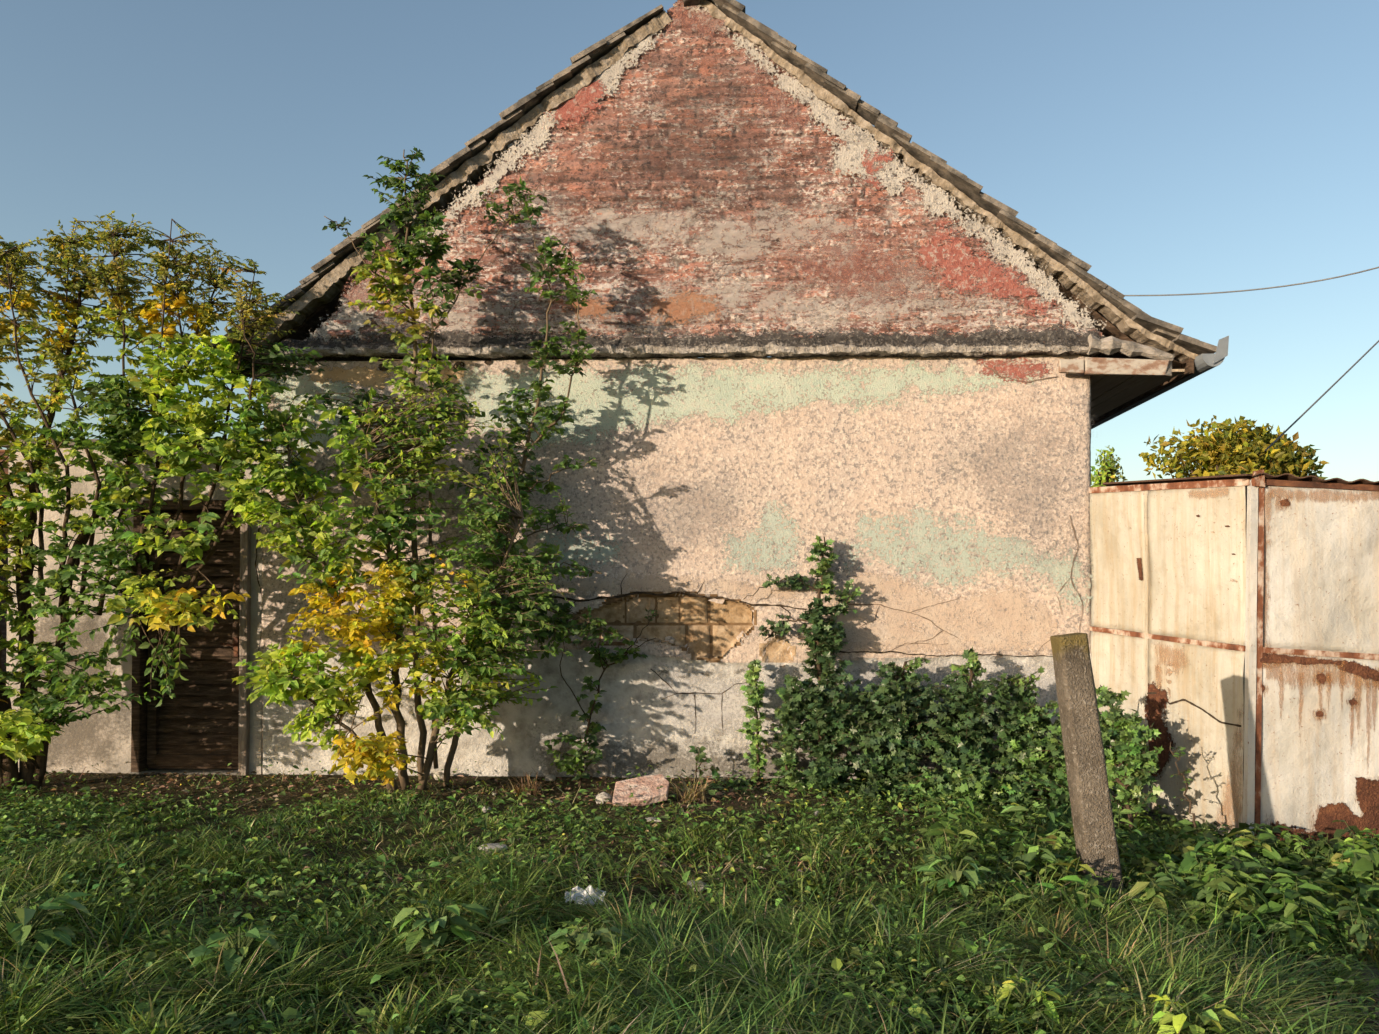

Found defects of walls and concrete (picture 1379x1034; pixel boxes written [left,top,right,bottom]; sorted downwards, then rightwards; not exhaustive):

peeling [304,1,1107,342]
spalling [529,499,807,668]
crack [531,515,1083,657]
crack [650,669,747,734]
rust [1142,681,1176,778]
crack [1147,692,1241,727]
rust [1260,653,1379,684]
rust [1263,777,1379,850]